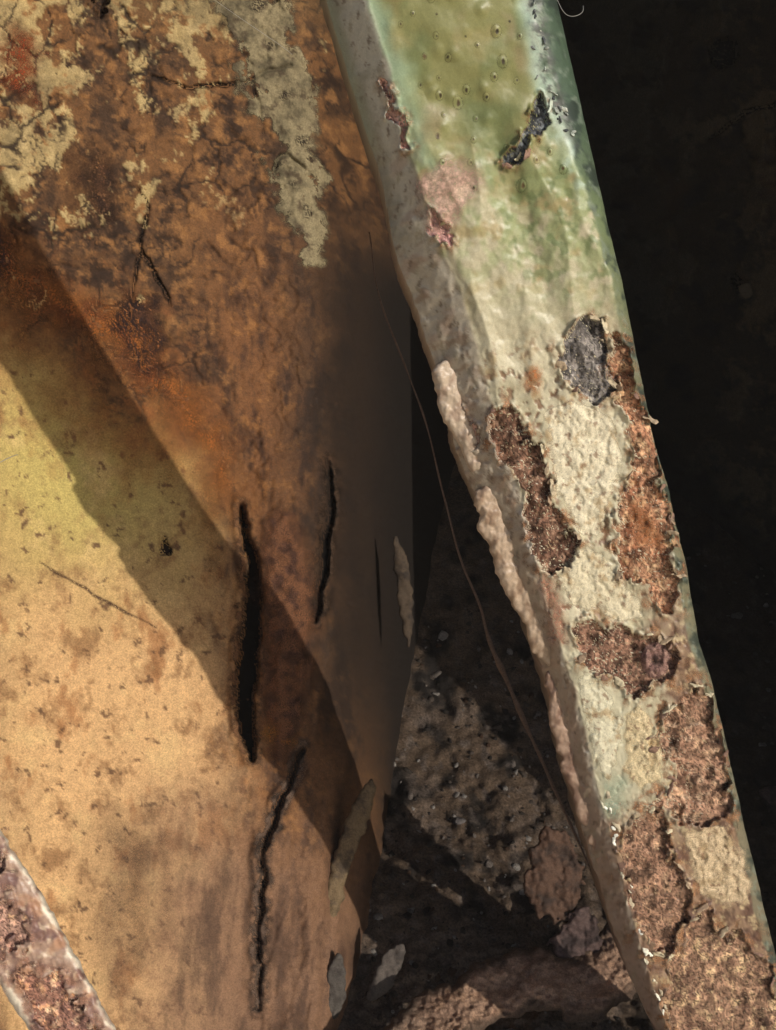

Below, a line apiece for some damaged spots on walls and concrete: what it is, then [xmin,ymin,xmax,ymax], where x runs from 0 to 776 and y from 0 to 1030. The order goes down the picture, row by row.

rust [2,32,35,88]
peeling [502,148,531,169]
peeling [547,90,576,136]
rust [108,291,168,375]
crack [129,191,170,310]
crack [310,452,341,630]
peeling [548,313,688,614]
crack [229,497,267,765]
rust [0,829,116,1030]
crack [248,739,310,1012]
rust [381,922,637,1030]
peeling [572,617,776,1030]